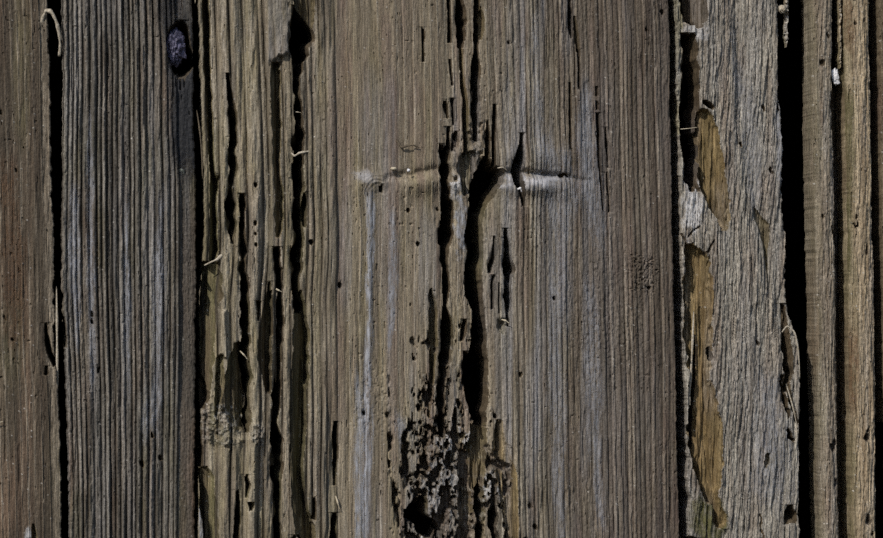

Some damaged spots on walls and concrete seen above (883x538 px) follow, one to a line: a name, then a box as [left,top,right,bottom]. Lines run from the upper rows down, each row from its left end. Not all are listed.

crack [419,29,427,62]
crack [435,0,526,437]
crack [214,6,316,538]
crack [196,423,204,466]
crack [456,478,499,538]
crack [758,513,766,538]